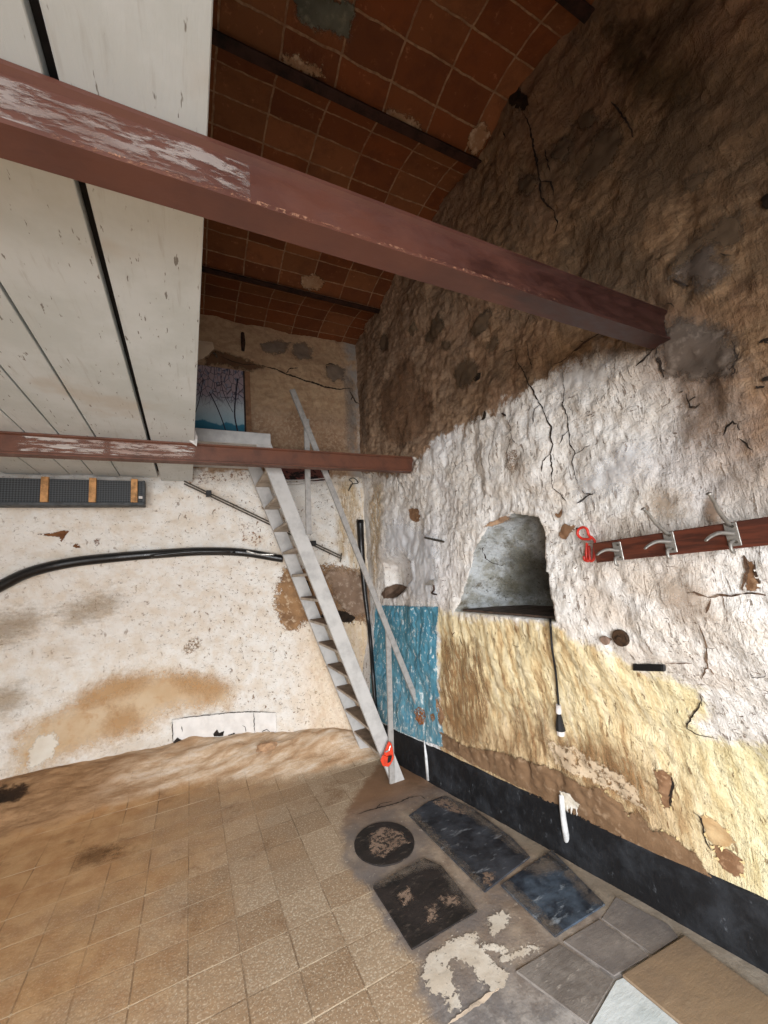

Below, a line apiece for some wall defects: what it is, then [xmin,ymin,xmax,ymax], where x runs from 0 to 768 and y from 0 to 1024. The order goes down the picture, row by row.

crack [502,114,558,233]
crack [223,357,359,404]
crack [474,334,598,503]
damp [0,671,229,803]
peeling [430,698,712,878]
peeling [701,814,746,879]